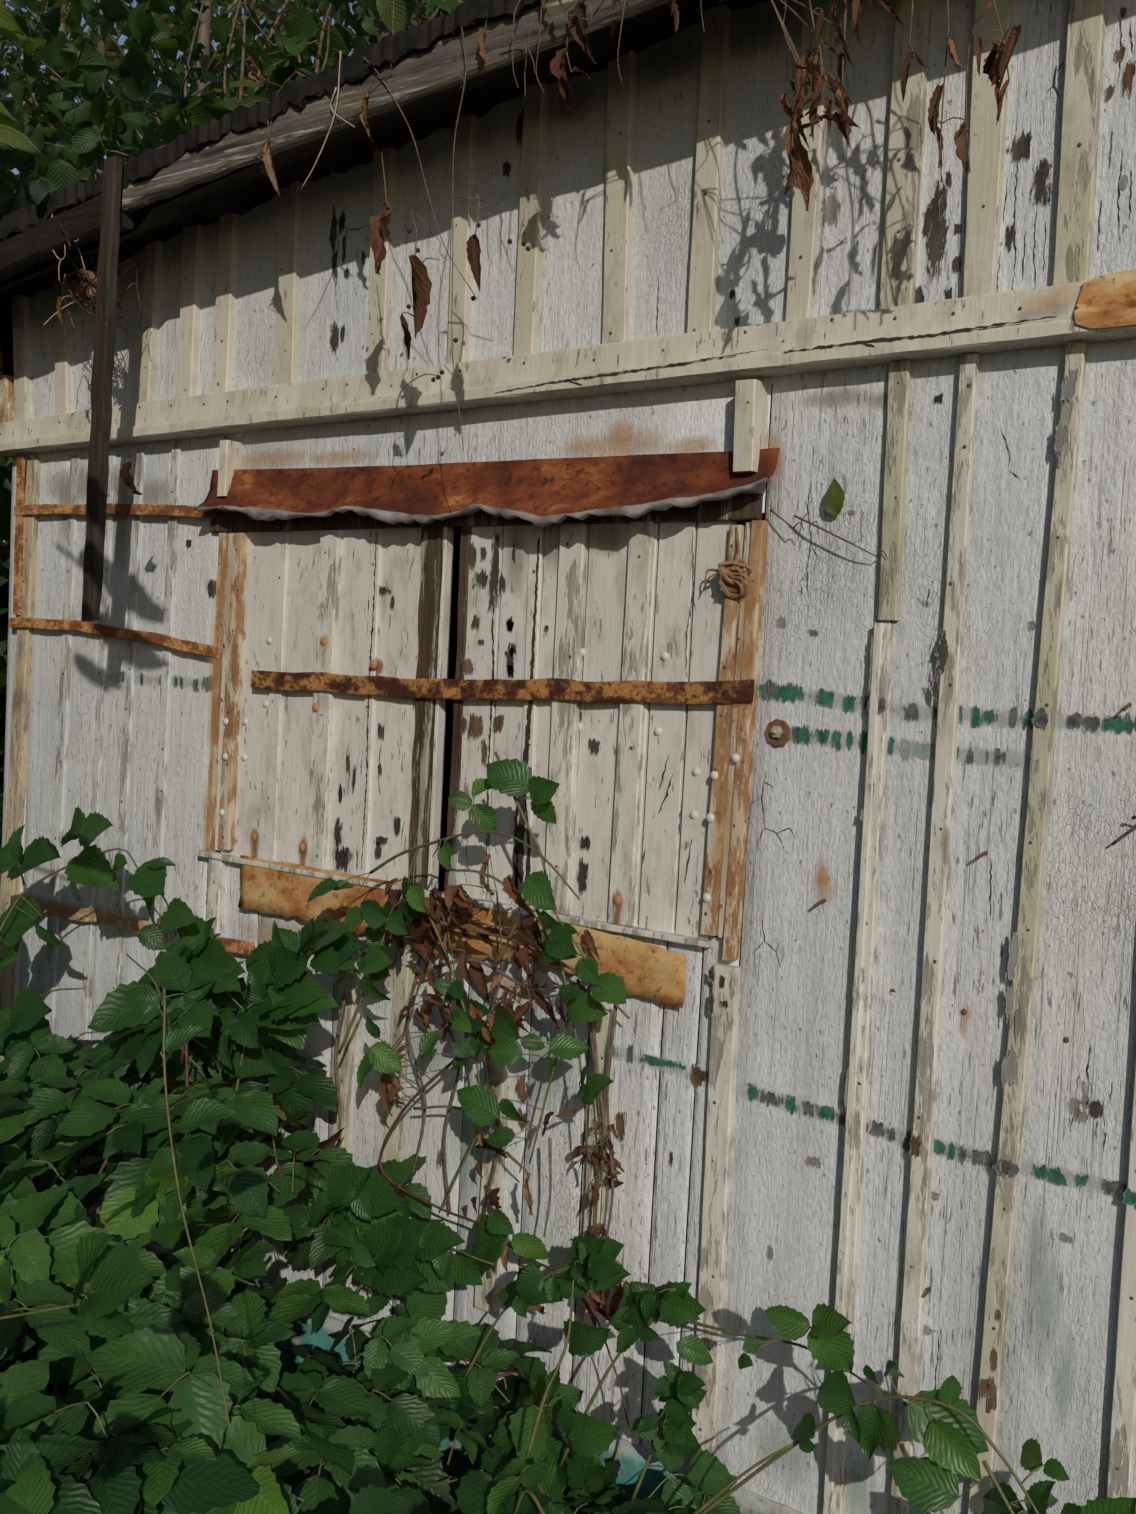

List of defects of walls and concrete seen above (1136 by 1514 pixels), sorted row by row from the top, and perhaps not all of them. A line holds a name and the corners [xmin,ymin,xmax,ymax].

peeling [1104,45,1136,103]
peeling [1006,129,1053,214]
peeling [915,169,962,304]
peeling [1004,224,1015,253]
peeling [330,320,345,360]
peeling [463,530,516,679]
peeling [461,711,504,767]
peeling [588,738,600,756]
peeling [757,629,949,761]
peeling [958,704,1136,736]
peeling [332,721,401,874]
peeling [576,835,591,895]